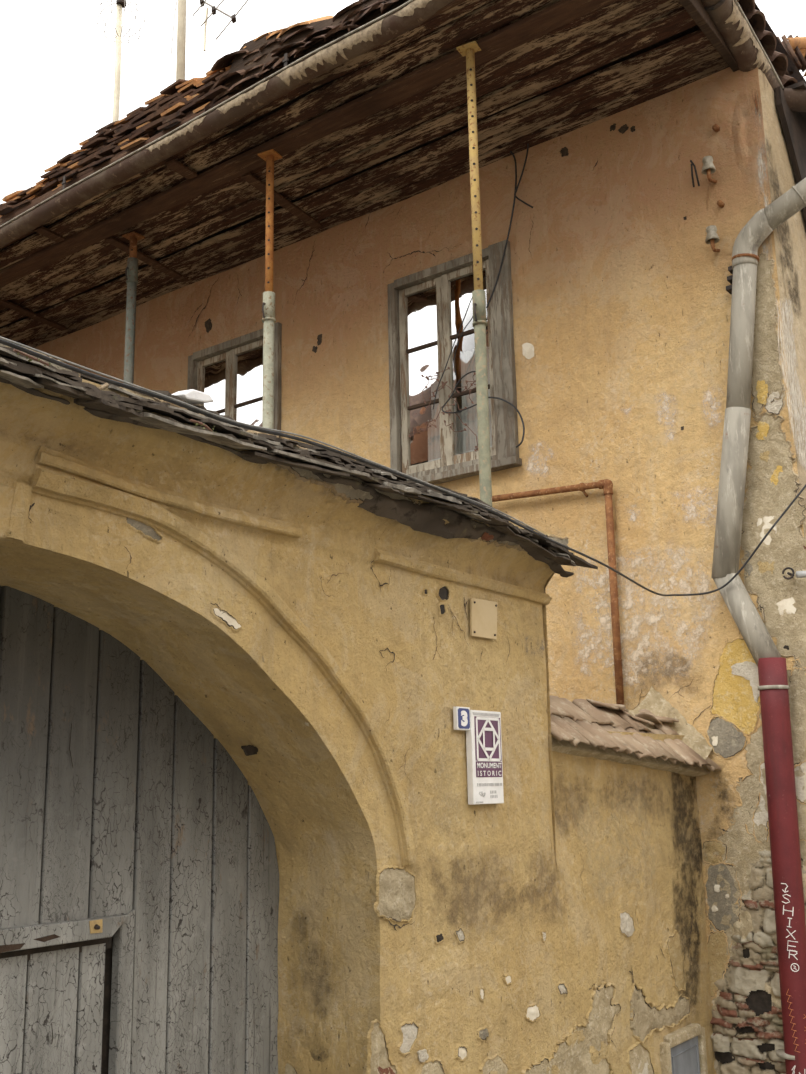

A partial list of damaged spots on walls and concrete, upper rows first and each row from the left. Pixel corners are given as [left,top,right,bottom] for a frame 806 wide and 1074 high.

peeling [610,123,635,134]
spalling [123,517,163,544]
peeling [741,252,806,866]
spalling [210,605,243,633]
spalling [702,637,771,1012]
leakage [673,772,703,1014]
spalling [479,929,691,1074]
spalling [366,1019,447,1074]
spalling [455,1044,468,1063]